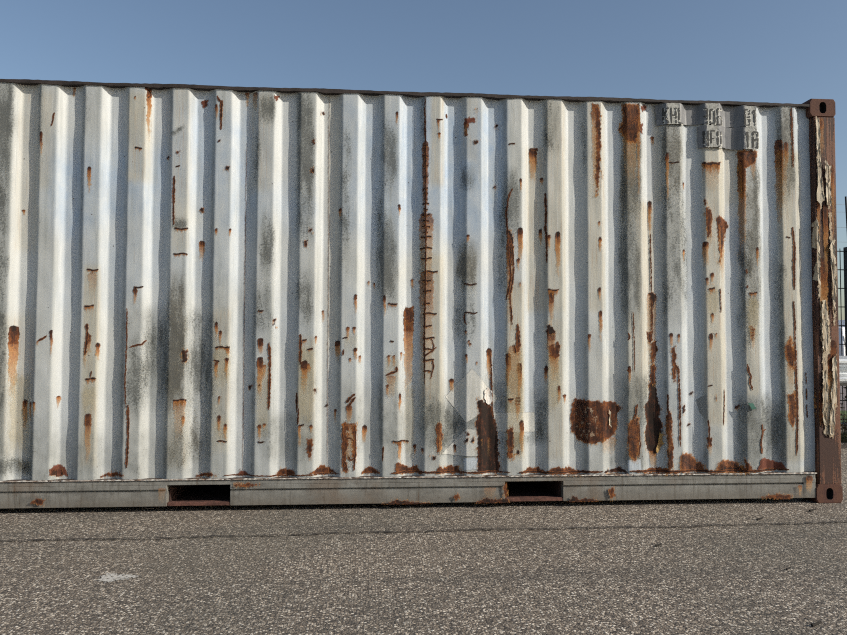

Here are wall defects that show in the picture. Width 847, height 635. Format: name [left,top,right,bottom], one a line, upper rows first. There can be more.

rust [591,103,602,197]
rust [618,103,641,151]
rust [737,149,757,208]
peeling [811,116,838,438]
rust [8,325,20,371]
rust [257,338,271,410]
rust [299,334,317,382]
rust [335,327,361,362]
rust [383,295,414,392]
rust [391,199,789,477]
rust [814,340,836,424]
rust [195,393,380,488]